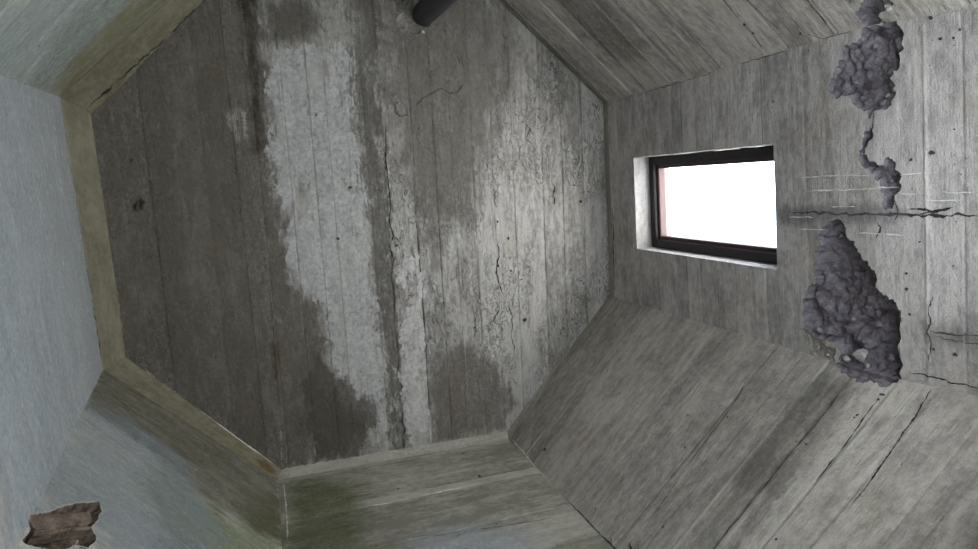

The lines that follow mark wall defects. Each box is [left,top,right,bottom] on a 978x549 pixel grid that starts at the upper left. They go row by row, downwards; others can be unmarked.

spalling [828,0,904,210]
damp [0,0,376,549]
spalling [800,219,911,401]
crack [796,201,977,238]
crack [850,298,978,506]
spalling [22,501,102,549]